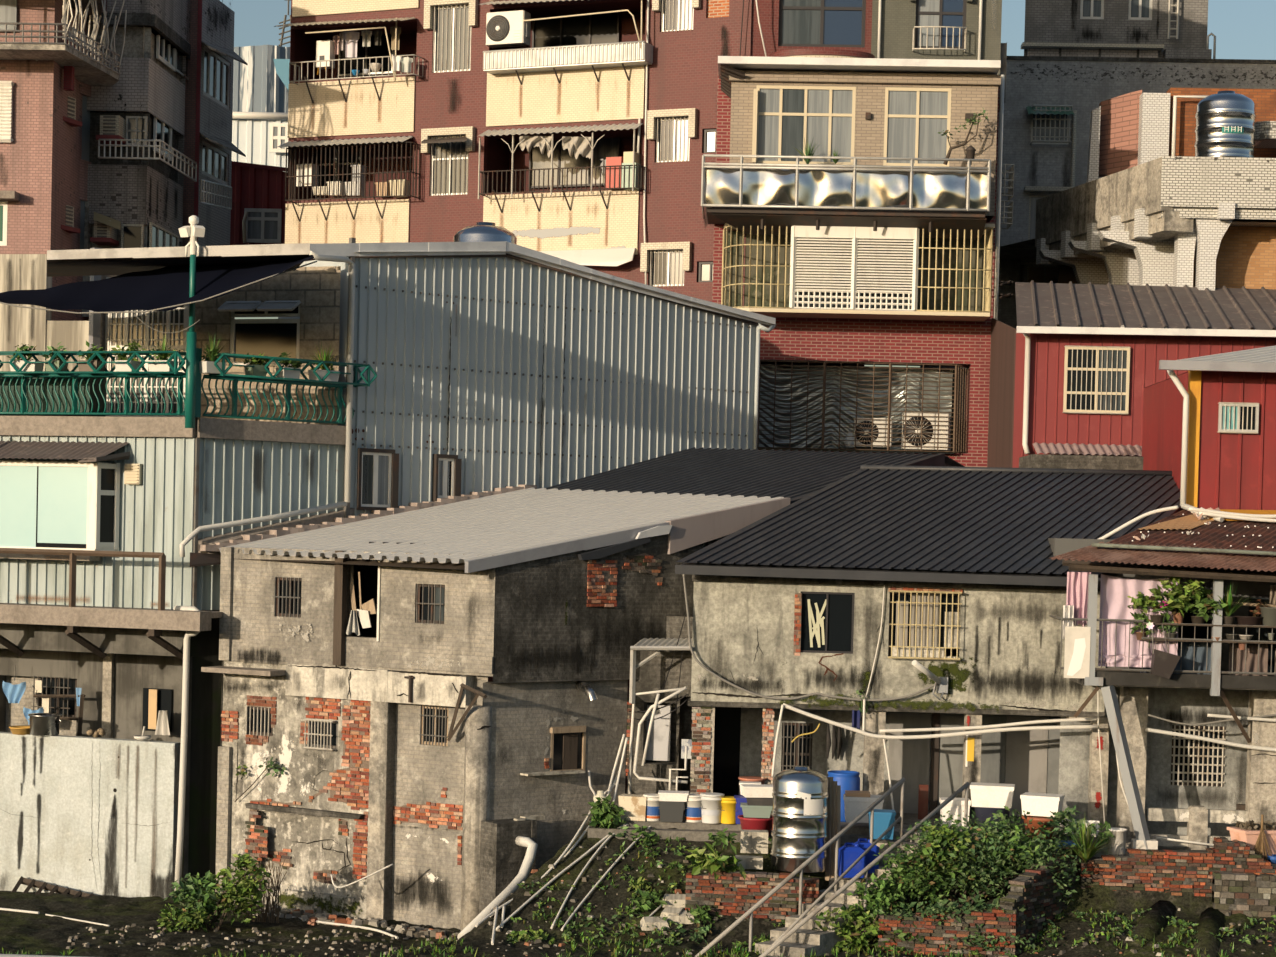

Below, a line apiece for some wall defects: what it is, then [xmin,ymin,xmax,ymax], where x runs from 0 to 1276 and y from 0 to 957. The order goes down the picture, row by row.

flaking render [587,553,663,607]
leakage [702,644,783,693]
leakage [806,609,880,695]
leakage [970,606,1083,697]
flaking render [221,695,277,746]
leakage [17,737,43,874]
leakage [104,796,127,896]
leakage [150,824,177,899]
flaking render [244,697,371,896]
flaking render [393,787,463,865]